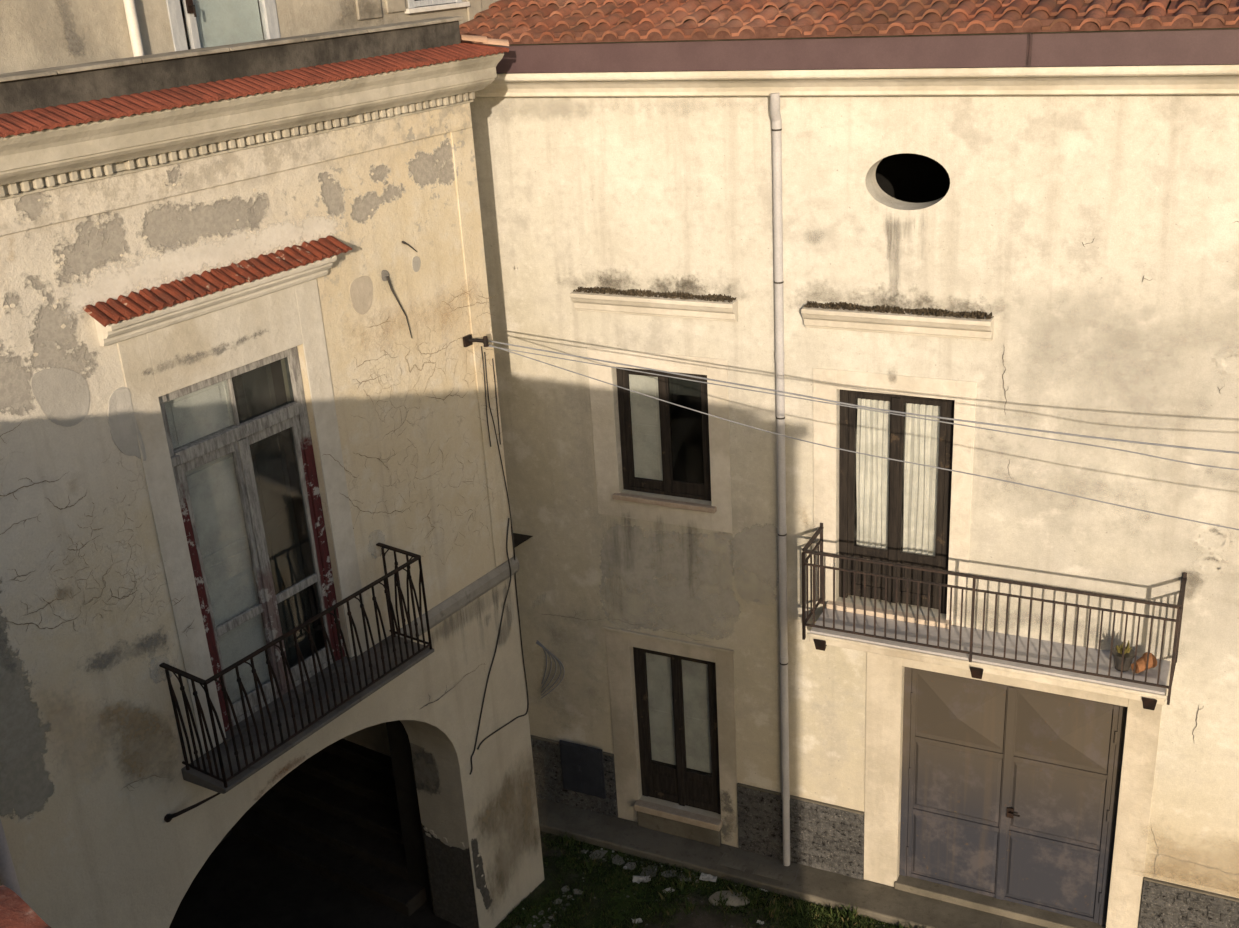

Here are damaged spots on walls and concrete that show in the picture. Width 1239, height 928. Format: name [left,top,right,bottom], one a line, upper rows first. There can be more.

peeling [0,161,270,417]
peeling [317,138,458,225]
crack [323,288,502,565]
crack [0,473,194,638]